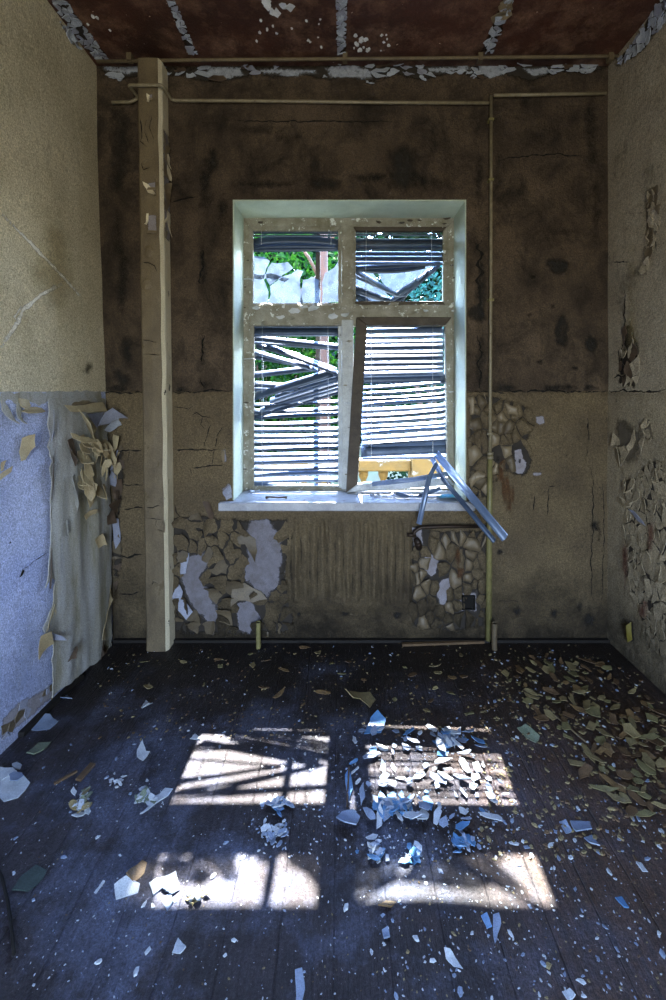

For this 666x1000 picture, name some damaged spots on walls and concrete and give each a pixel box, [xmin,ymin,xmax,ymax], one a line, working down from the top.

peeling [52,0,138,81]
peeling [165,0,602,84]
peeling [617,0,666,65]
peeling [142,132,172,242]
leakage [468,263,485,321]
crack [172,335,233,475]
peeling [468,393,545,500]
peeling [617,324,640,389]
peeling [0,390,127,755]
peeling [171,501,294,637]
peeling [407,526,486,633]
peeling [610,418,666,658]